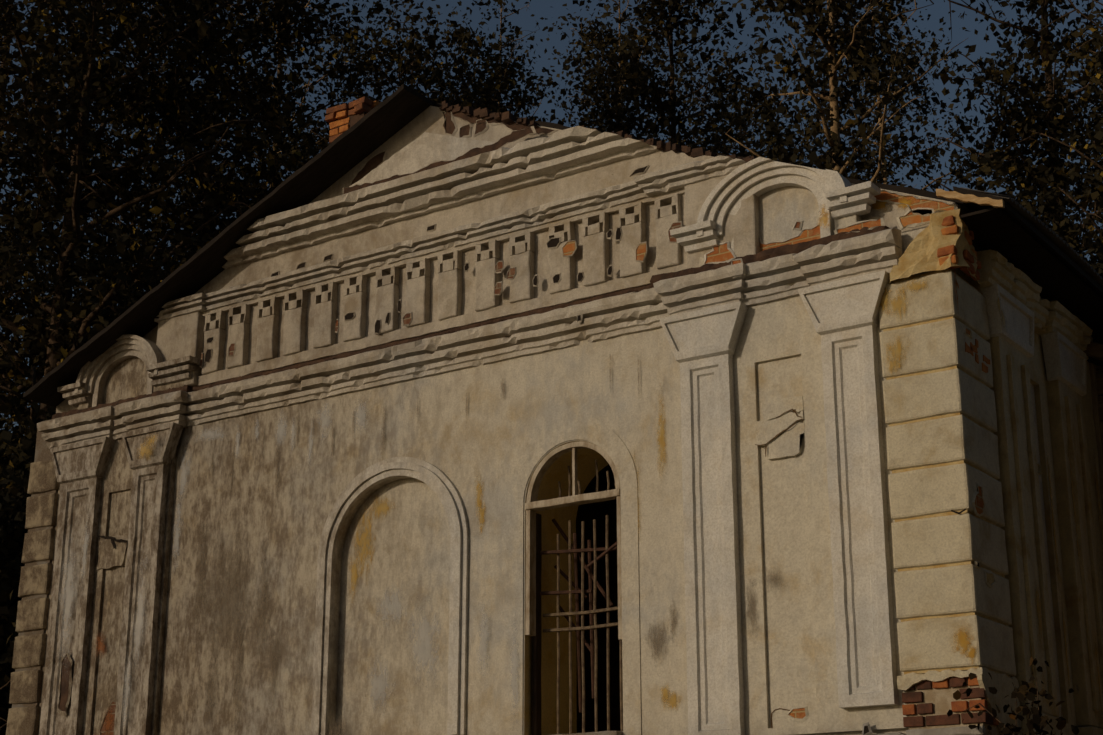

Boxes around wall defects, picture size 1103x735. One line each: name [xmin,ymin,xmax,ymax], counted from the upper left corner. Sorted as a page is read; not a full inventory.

flaking render [342,107,558,195]
flaking render [703,241,742,278]
flaking render [759,219,821,252]
spalling [834,190,981,292]
flaking render [755,396,805,460]
spalling [897,667,1023,735]